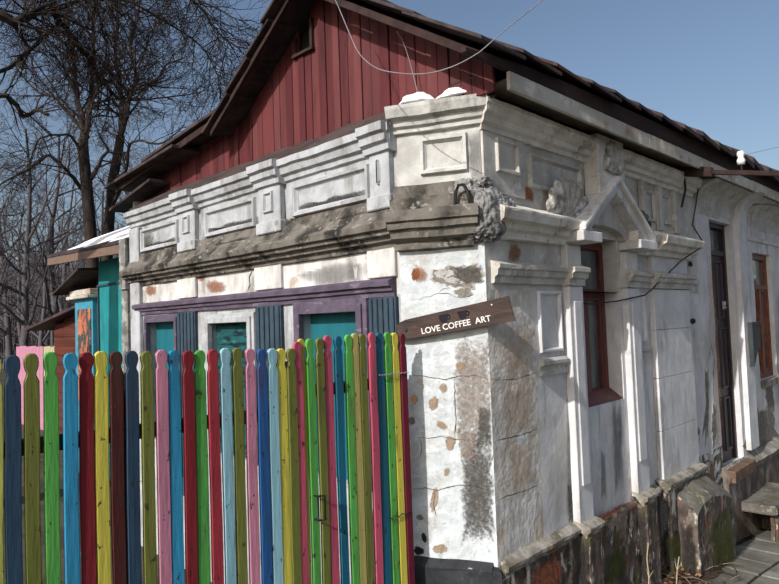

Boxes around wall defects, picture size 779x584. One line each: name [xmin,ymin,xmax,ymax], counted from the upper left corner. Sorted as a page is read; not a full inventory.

flaking render [430,263,486,298]
water stain [454,344,494,539]
crack [415,373,534,457]